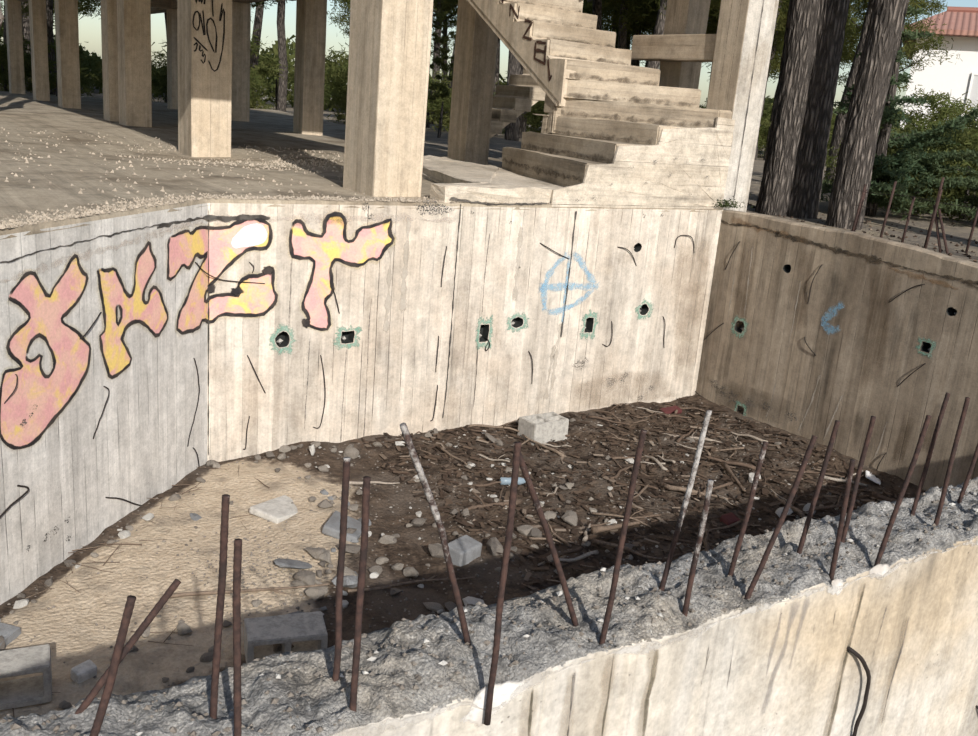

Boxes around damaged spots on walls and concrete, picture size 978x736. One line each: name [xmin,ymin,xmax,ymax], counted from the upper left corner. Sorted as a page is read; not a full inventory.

crack [719,0,764,198]
crack [0,211,270,455]
crack [721,219,978,288]
spalling [75,579,181,736]
spalling [210,494,242,736]
spalling [332,457,379,712]
spalling [400,423,471,646]
spalling [465,441,579,726]
spalling [597,429,647,645]
spalling [649,409,712,591]
spalling [682,479,714,617]
spalling [870,392,950,578]